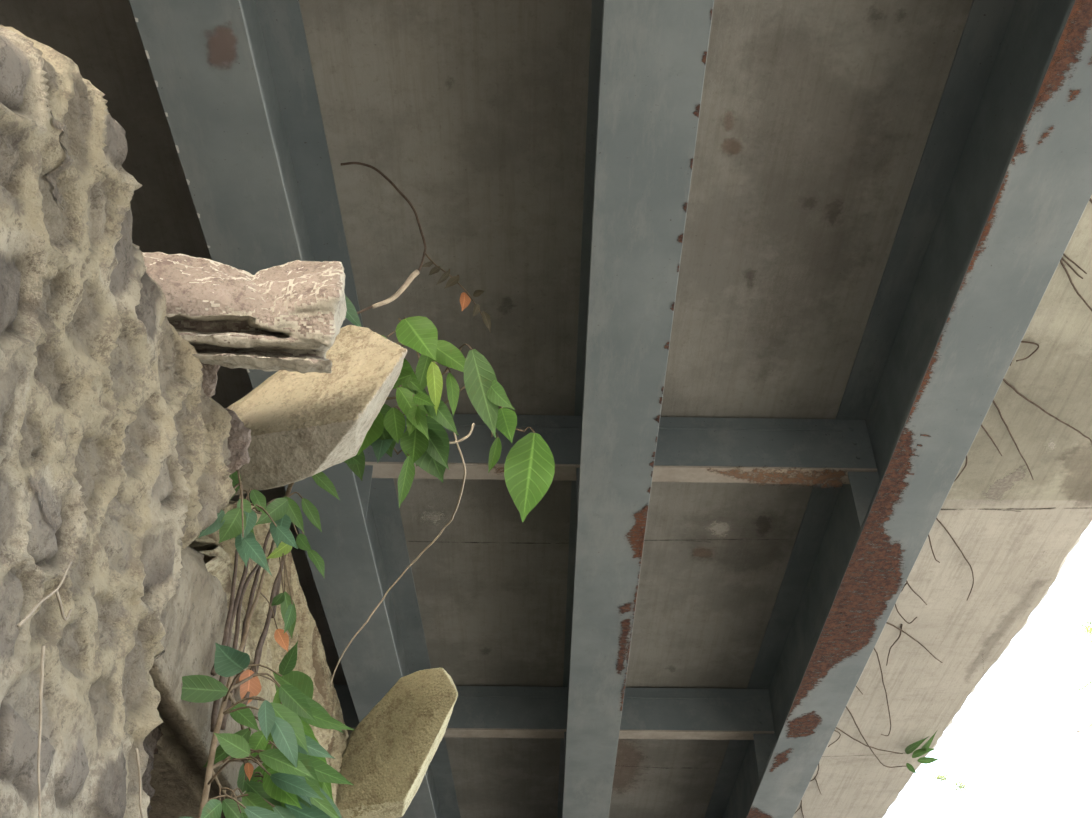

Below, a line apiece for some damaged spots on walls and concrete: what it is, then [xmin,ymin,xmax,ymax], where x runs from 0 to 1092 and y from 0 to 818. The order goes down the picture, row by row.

rust [208,27,236,66]
rust [769,0,1092,772]
crack [983,506,1086,514]
rust [616,437,657,711]
rust [747,806,772,818]